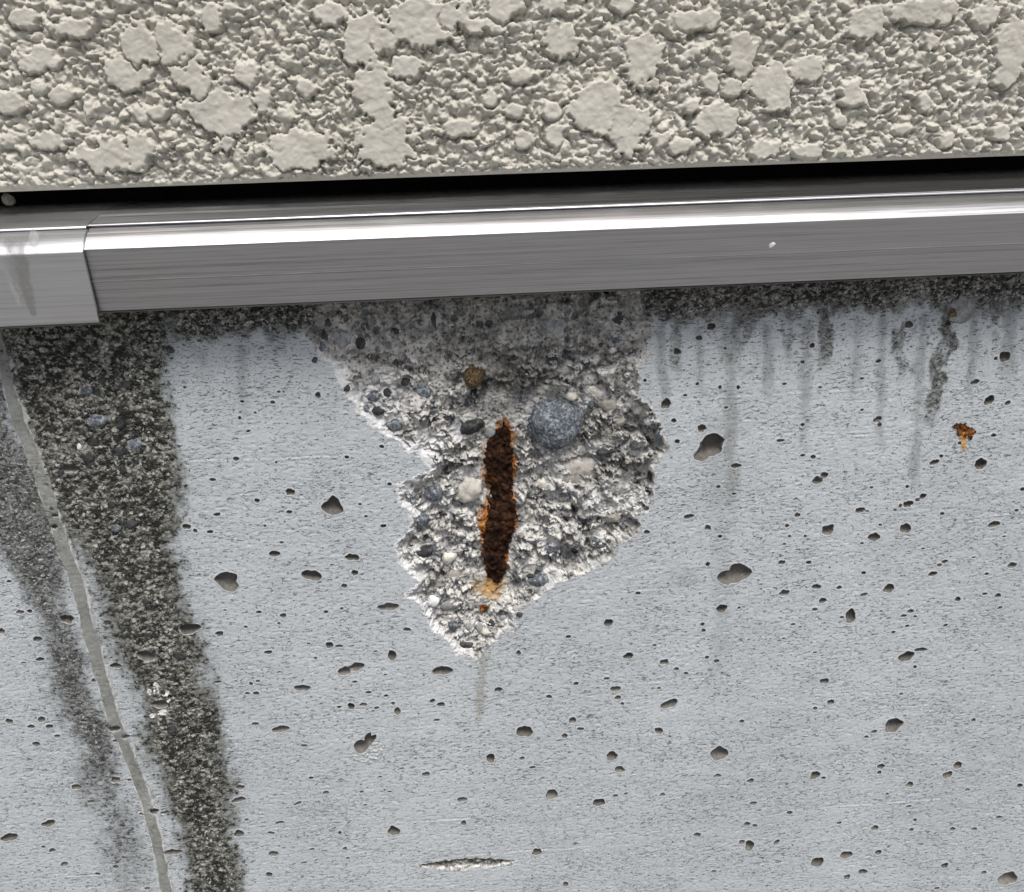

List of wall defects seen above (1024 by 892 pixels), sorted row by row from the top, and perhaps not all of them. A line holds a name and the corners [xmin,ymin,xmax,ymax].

water stain [818,305,838,370]
water stain [890,316,915,380]
water stain [923,306,959,427]
spalling [305,290,670,661]
corrosion [473,416,520,611]
corrosion [952,423,976,451]
water stain [0,310,258,892]